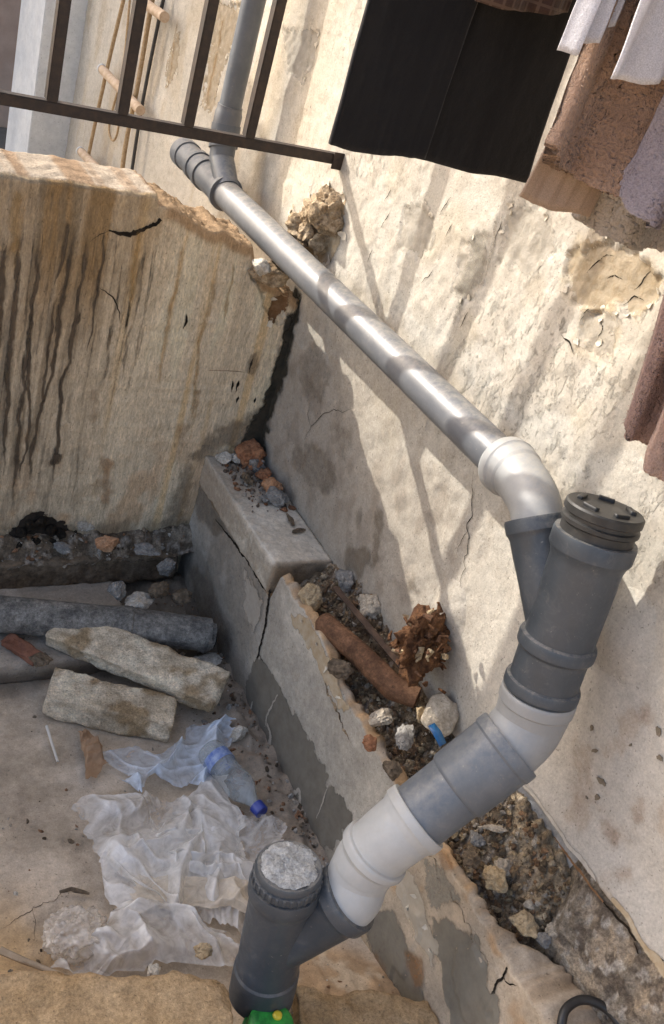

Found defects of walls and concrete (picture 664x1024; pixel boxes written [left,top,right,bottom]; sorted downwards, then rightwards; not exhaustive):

crack [90,218,162,242]
spalling [248,258,289,328]
peeling [561,237,662,358]
water stain [0,225,121,495]
water stain [196,287,301,458]
crack [457,480,473,584]
crack [215,519,271,661]
water stain [243,569,263,633]
peeling [396,870,439,968]
crack [491,967,515,994]